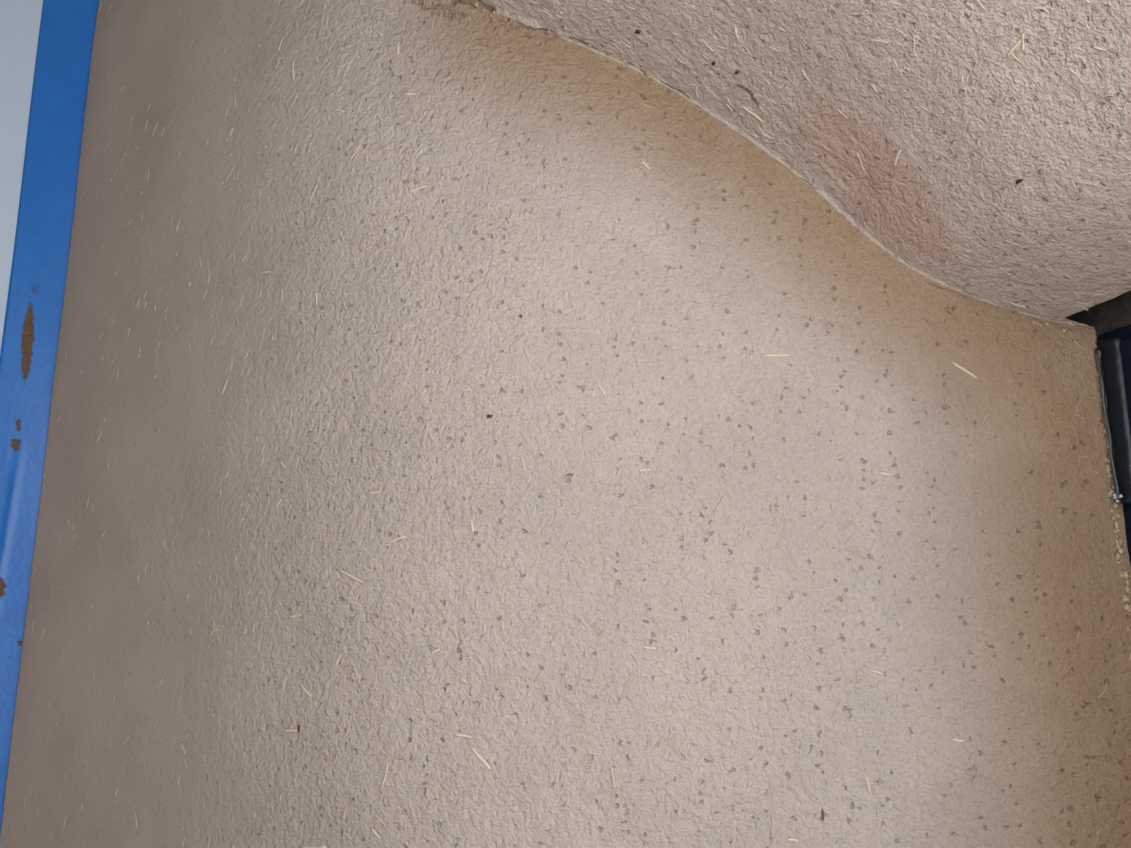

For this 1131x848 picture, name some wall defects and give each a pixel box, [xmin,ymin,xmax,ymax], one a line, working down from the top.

spalling [412,0,497,23]